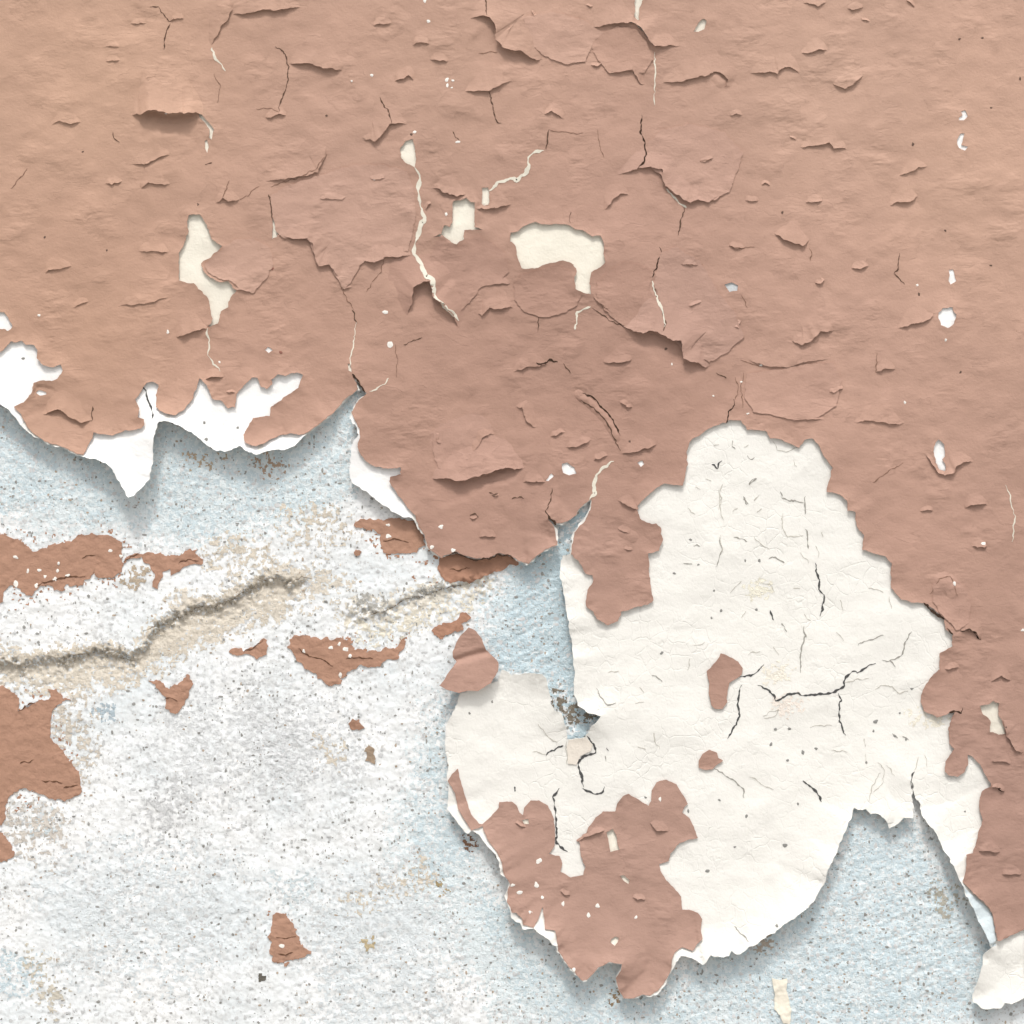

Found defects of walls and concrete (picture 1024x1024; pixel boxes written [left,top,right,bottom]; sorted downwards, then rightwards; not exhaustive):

crack [489,130,604,191]
crack [638,52,656,168]
peeling [138,139,613,337]
crack [412,168,459,321]
peeling [0,312,305,498]
peeling [349,415,413,519]
peeling [513,353,548,372]
crack [581,393,621,500]
crack [359,552,514,615]
crack [683,360,927,800]
peeling [432,420,1024,1009]
crack [533,724,609,852]